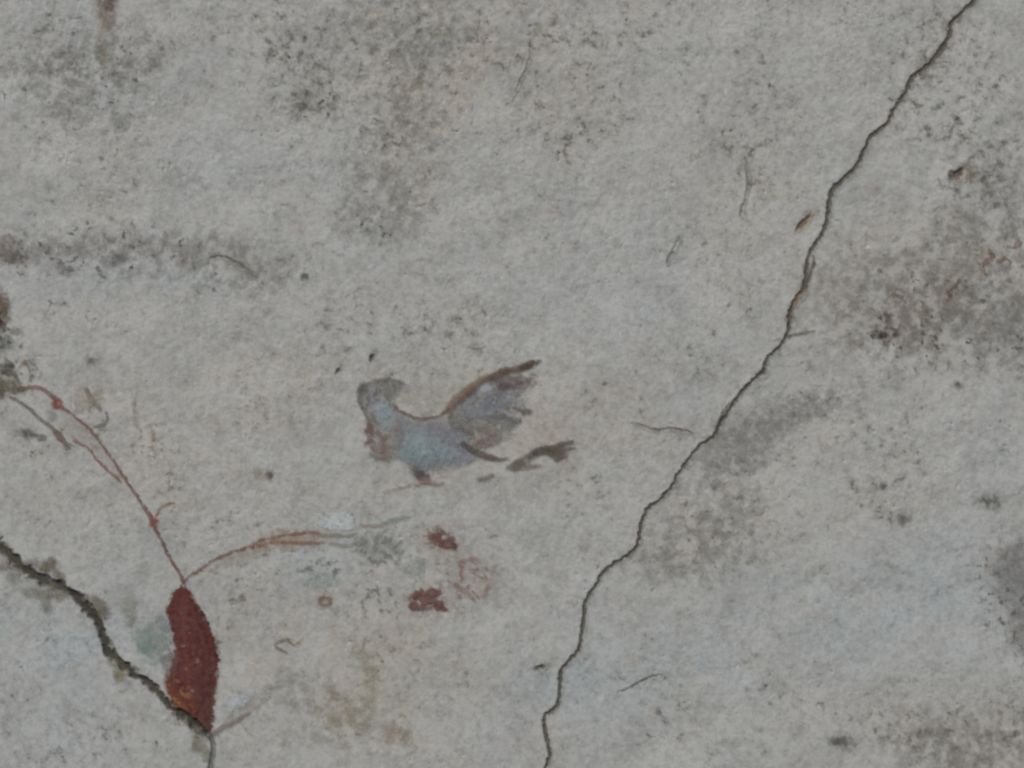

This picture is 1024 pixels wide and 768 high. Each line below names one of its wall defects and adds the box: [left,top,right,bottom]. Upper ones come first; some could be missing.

crack [0,543,248,768]
crack [542,0,976,768]